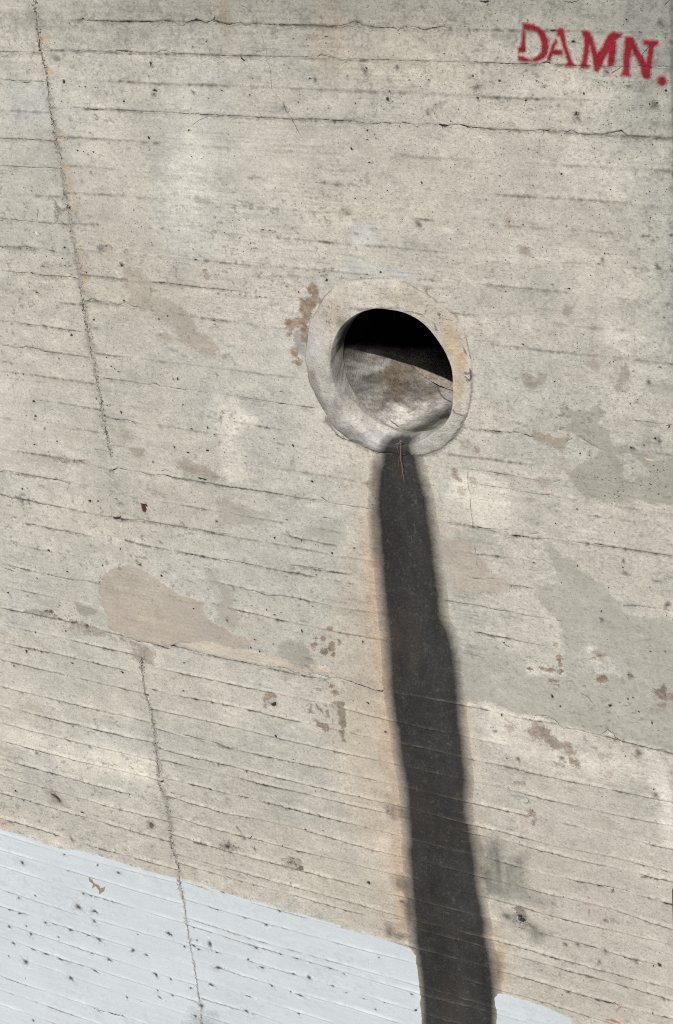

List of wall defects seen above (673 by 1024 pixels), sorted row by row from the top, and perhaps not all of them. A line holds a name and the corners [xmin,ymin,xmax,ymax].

crack [0,0,673,571]
crack [0,562,100,583]
crack [108,516,283,599]
crack [5,742,75,761]
crack [34,704,115,733]
water stain [313,391,673,1024]